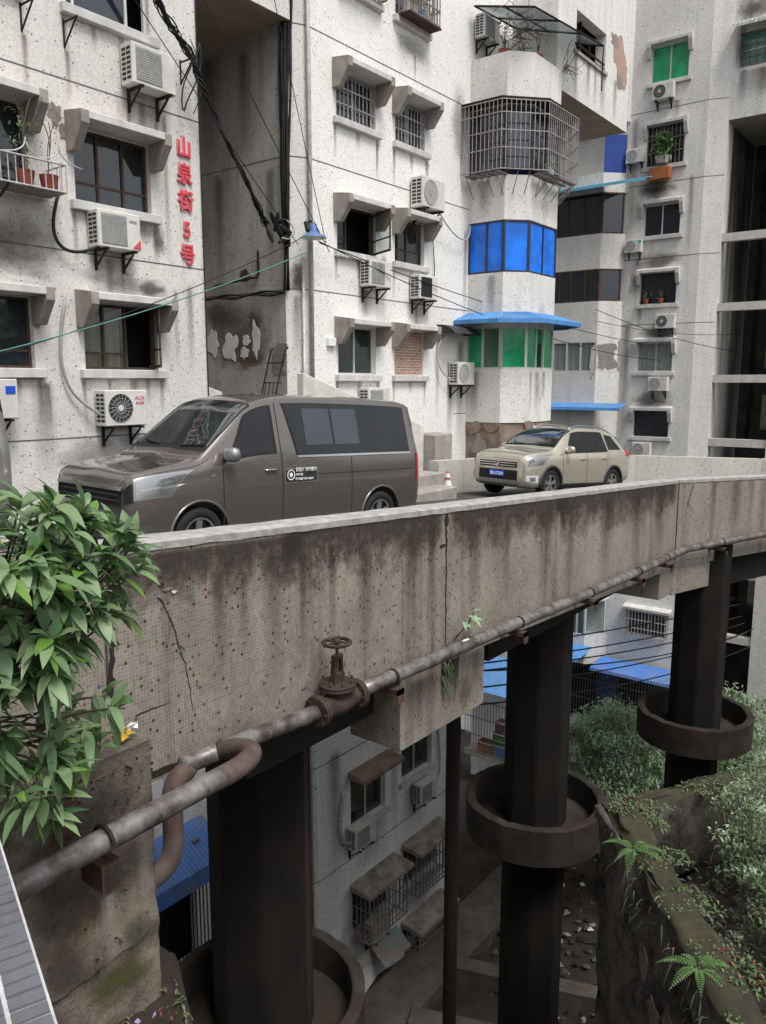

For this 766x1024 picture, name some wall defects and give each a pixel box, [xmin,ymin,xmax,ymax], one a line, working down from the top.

flaking render [611,32,627,90]
peeling [207,319,261,363]
water stain [210,309,261,366]
flaking render [589,342,620,380]
water stain [123,484,675,591]
crack [442,524,450,669]
crack [135,597,193,717]